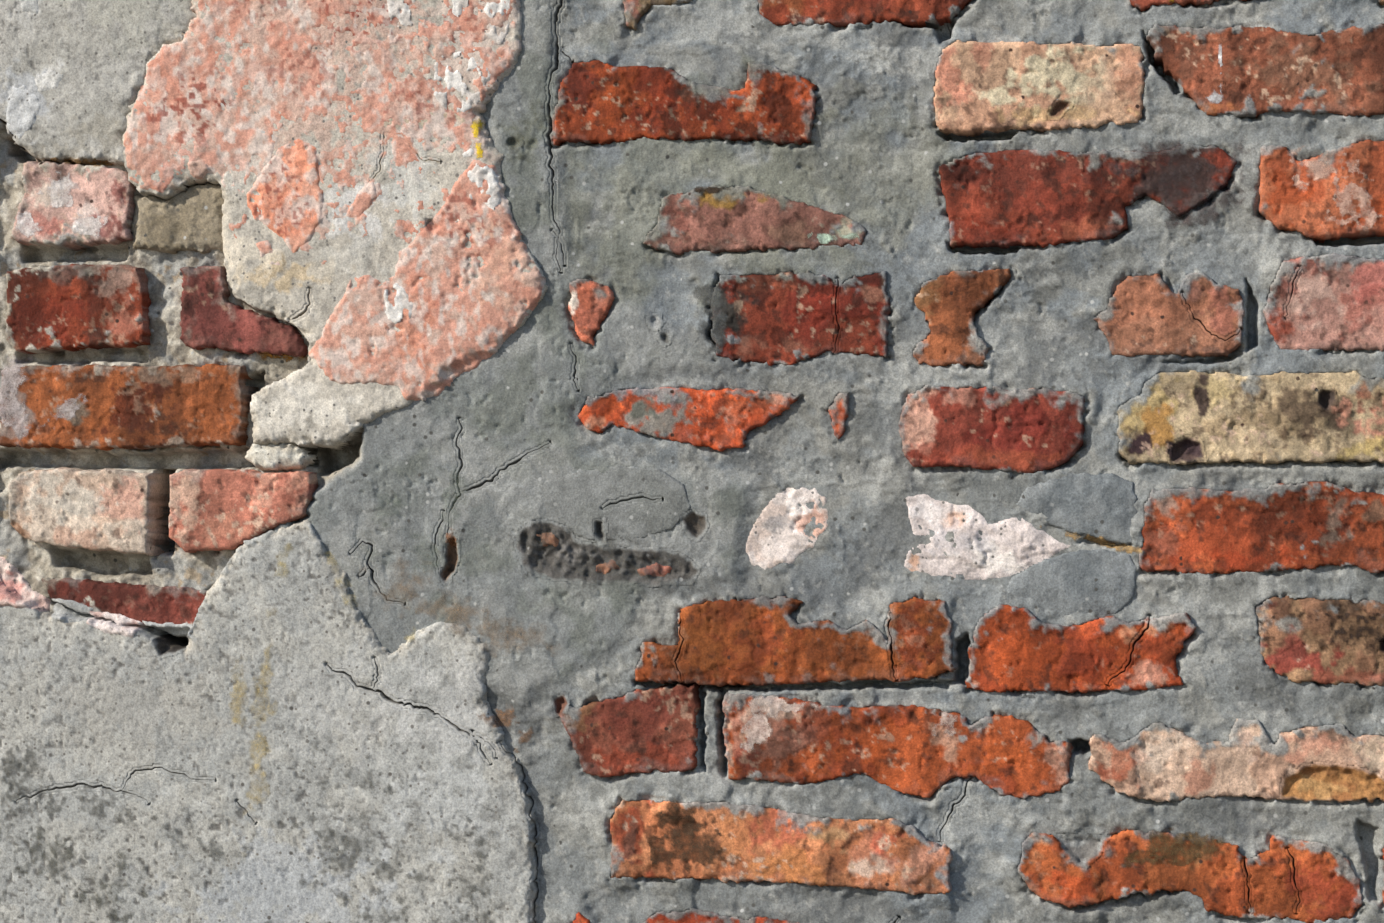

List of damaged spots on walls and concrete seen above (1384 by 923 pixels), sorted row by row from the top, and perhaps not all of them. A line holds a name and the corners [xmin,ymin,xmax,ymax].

peeling [123,0,546,401]
crack [543,0,573,272]
flaking render [0,556,193,638]
crack [349,538,405,606]
crack [432,418,552,577]
crack [14,764,257,825]
crack [325,657,542,923]